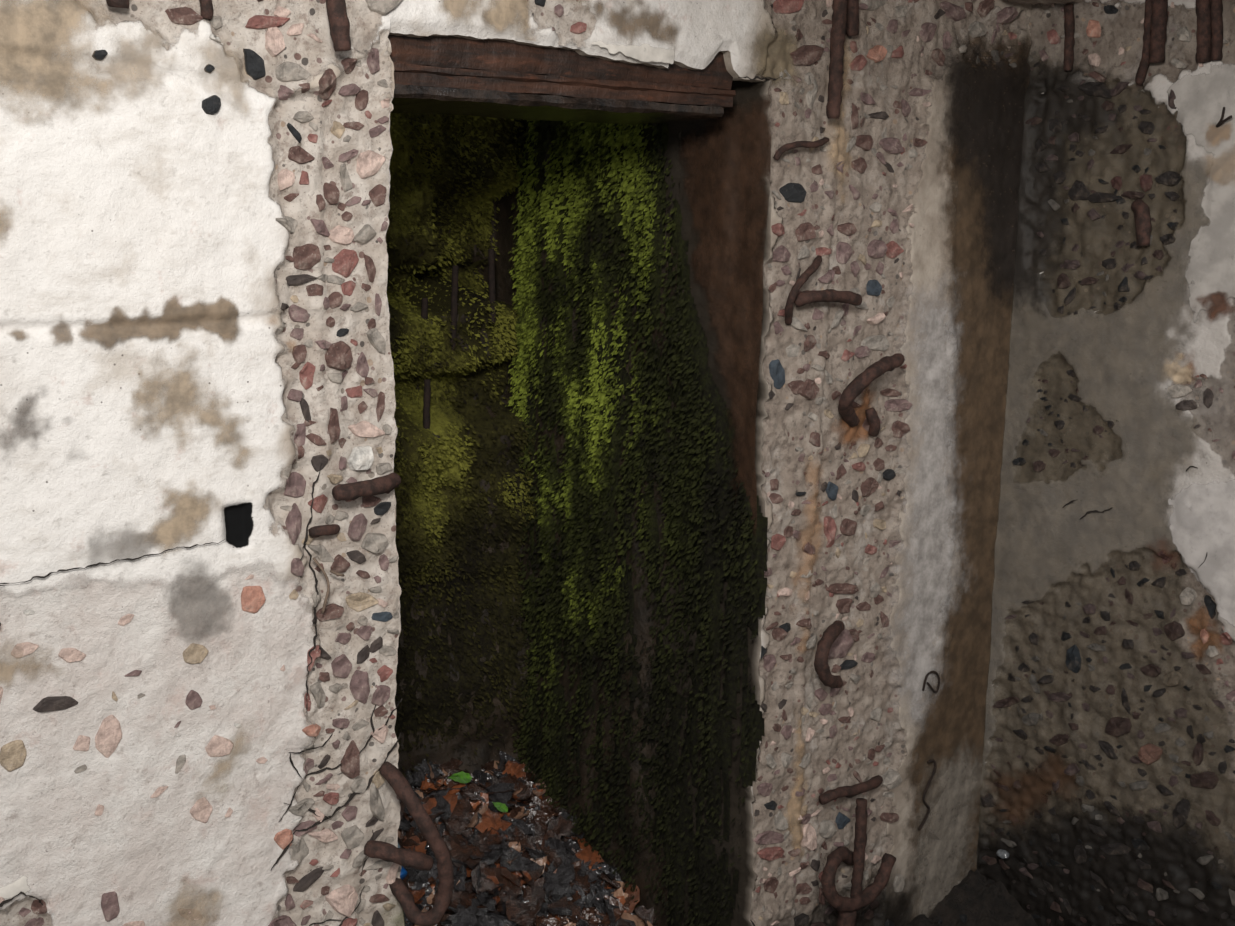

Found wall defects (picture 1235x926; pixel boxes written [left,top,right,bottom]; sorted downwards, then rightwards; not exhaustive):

leakage [0,0,161,106]
leakage [443,0,532,41]
leakage [578,0,677,42]
leakage [755,30,796,84]
leakage [52,297,239,348]
spalling [0,0,454,926]
rust [841,388,870,443]
spalling [750,0,1235,926]
leakage [855,36,1235,926]
crack [0,539,225,586]
crack [300,464,322,711]
crack [271,698,402,870]